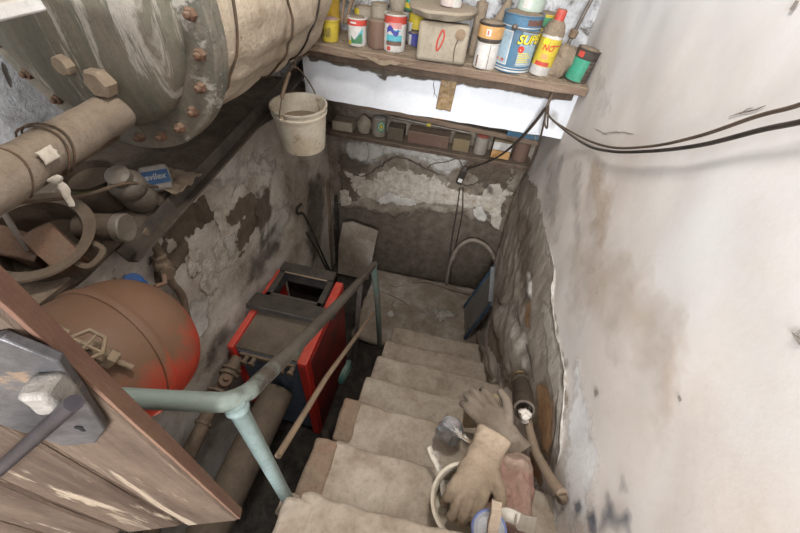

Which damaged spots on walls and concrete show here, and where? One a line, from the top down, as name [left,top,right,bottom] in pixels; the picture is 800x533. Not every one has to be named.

peeling [161,195,245,296]
spalling [340,141,568,472]
leakage [552,363,629,533]